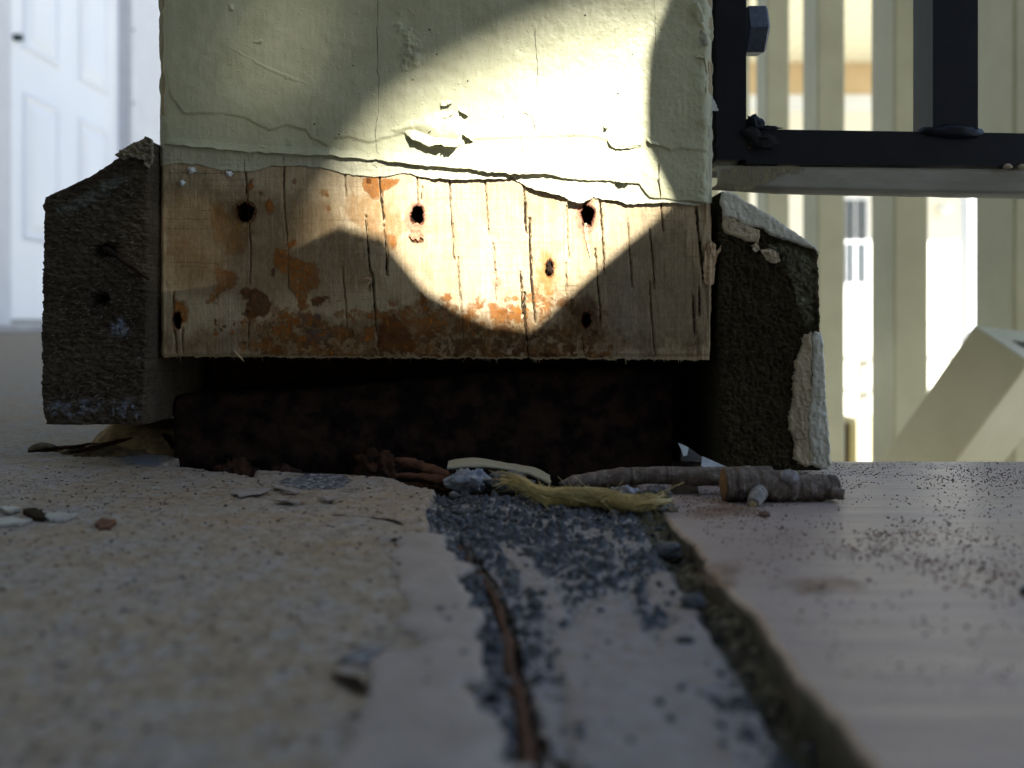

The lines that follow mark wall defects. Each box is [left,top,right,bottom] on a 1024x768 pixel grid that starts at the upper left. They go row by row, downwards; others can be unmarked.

peeling [438,100,468,118]
crack [244,160,252,283]
crack [342,178,387,352]
rust [363,177,400,222]
rust [207,240,612,358]
peeling [164,137,832,470]
crack [494,185,536,358]
crack [581,162,663,352]
crack [693,208,704,334]
crack [453,537,574,768]